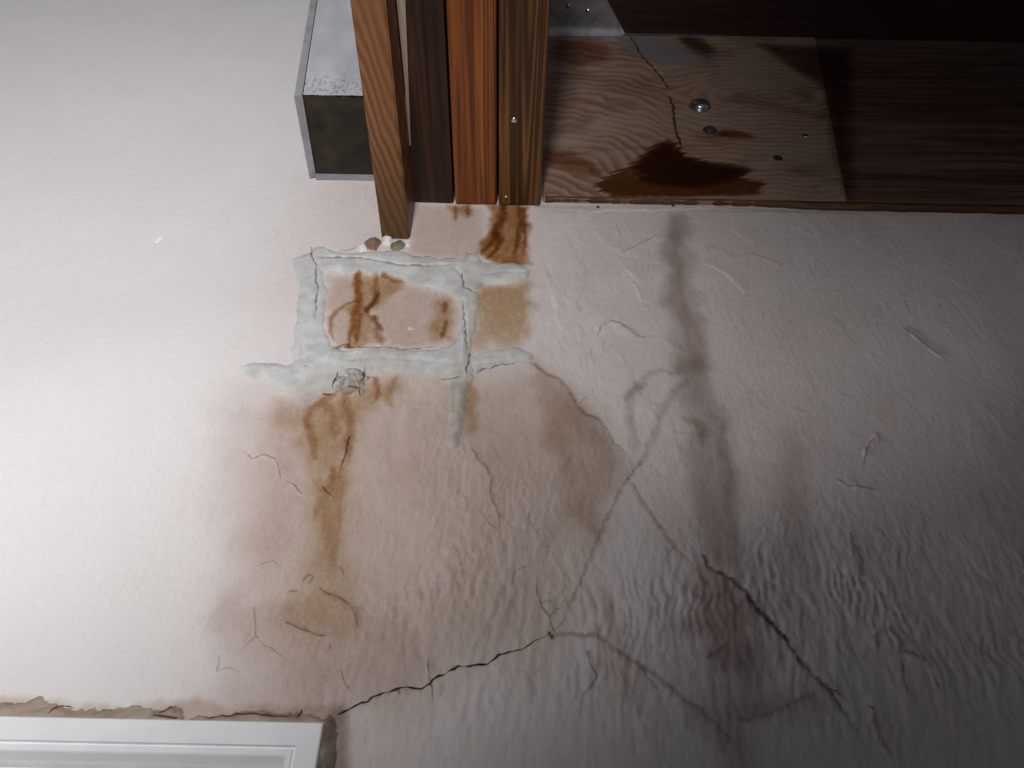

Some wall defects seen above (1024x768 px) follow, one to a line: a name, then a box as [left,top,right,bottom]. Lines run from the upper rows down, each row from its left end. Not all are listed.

leakage [595,142,764,196]
spalling [356,236,411,253]
spalling [325,368,370,395]
crack [341,636,552,713]
spalling [0,696,327,726]